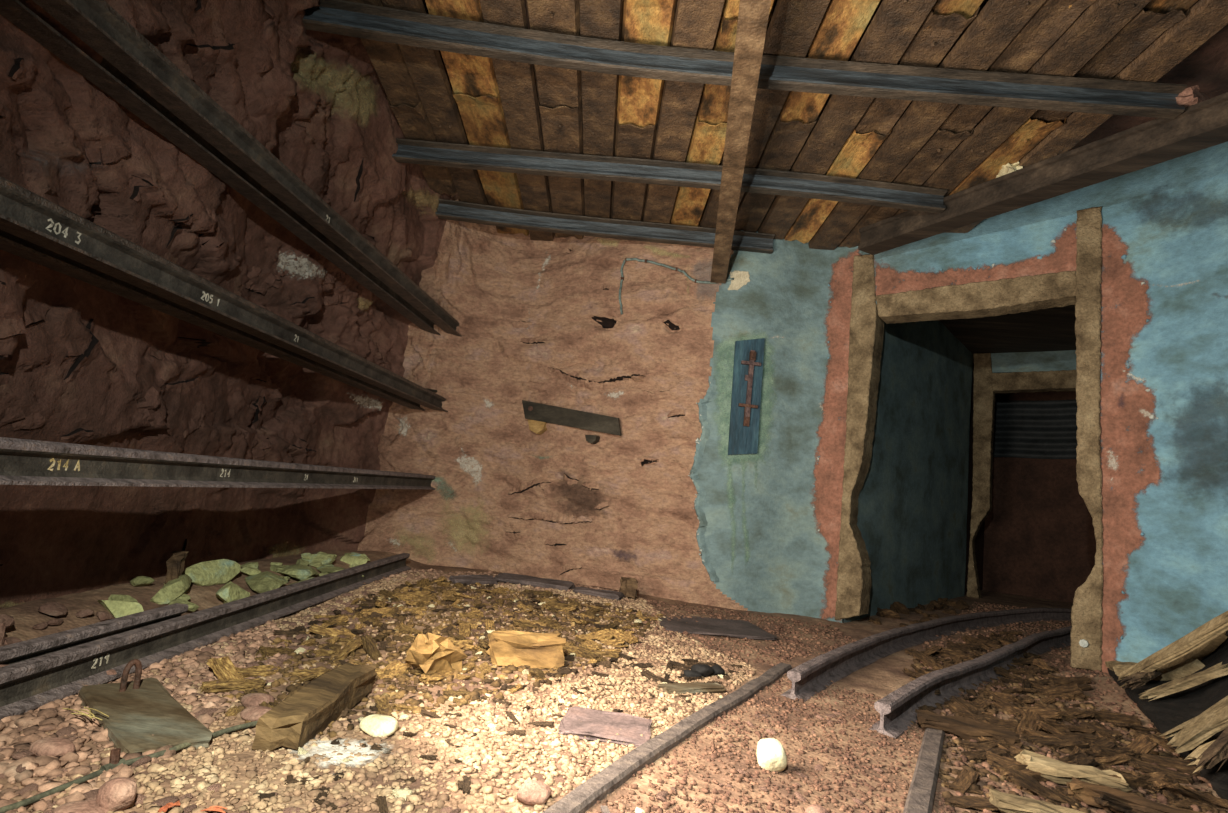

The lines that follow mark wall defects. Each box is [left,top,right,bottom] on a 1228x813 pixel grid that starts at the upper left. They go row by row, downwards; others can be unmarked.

crack [521,337,685,418]
peeling [688,376,719,582]
flaking render [811,222,1077,621]
flaking render [1100,224,1160,674]